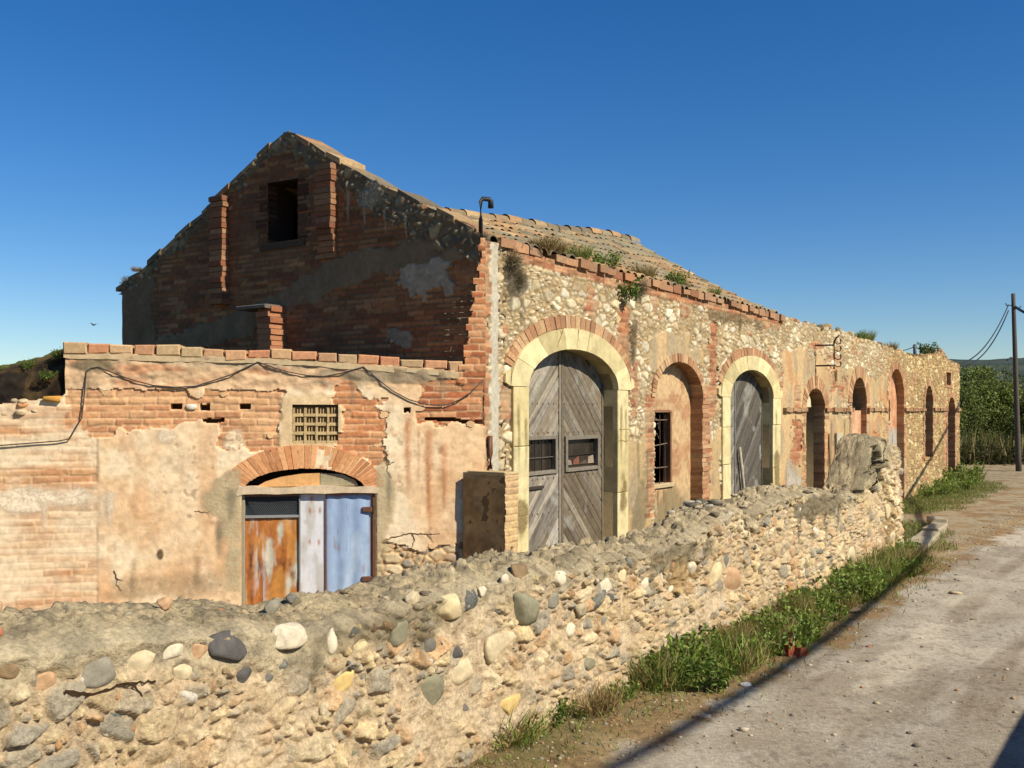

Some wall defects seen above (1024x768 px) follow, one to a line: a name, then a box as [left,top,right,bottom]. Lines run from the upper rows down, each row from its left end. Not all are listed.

peeling [397,256,458,301]
peeling [65,387,287,451]
peeling [332,380,390,465]